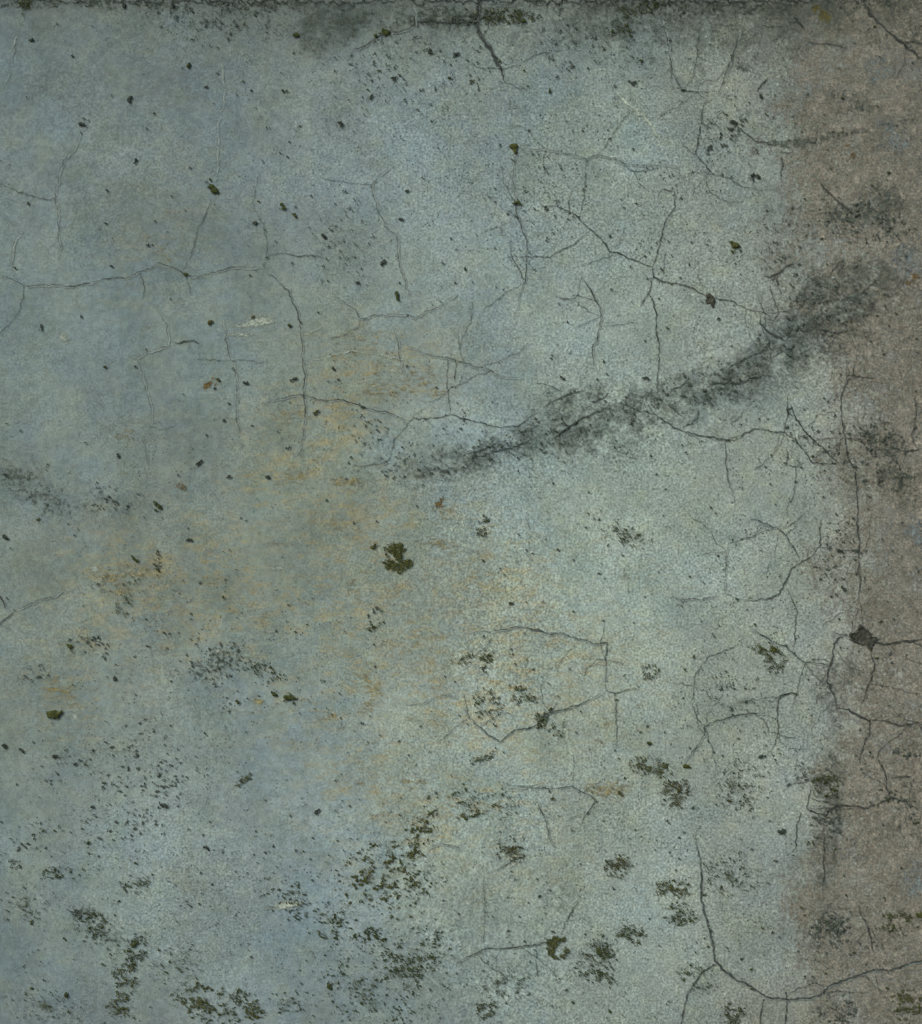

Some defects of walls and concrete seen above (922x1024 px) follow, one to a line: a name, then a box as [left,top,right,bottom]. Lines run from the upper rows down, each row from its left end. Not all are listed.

crack [1,0,922,392]
crack [0,214,556,467]
leakage [673,261,893,426]
leakage [445,389,659,469]
peeling [767,0,922,1024]
crack [0,591,63,623]
crack [408,626,625,742]
crack [615,357,922,849]
crack [508,779,602,843]
crack [458,906,575,978]
crack [681,848,922,1024]